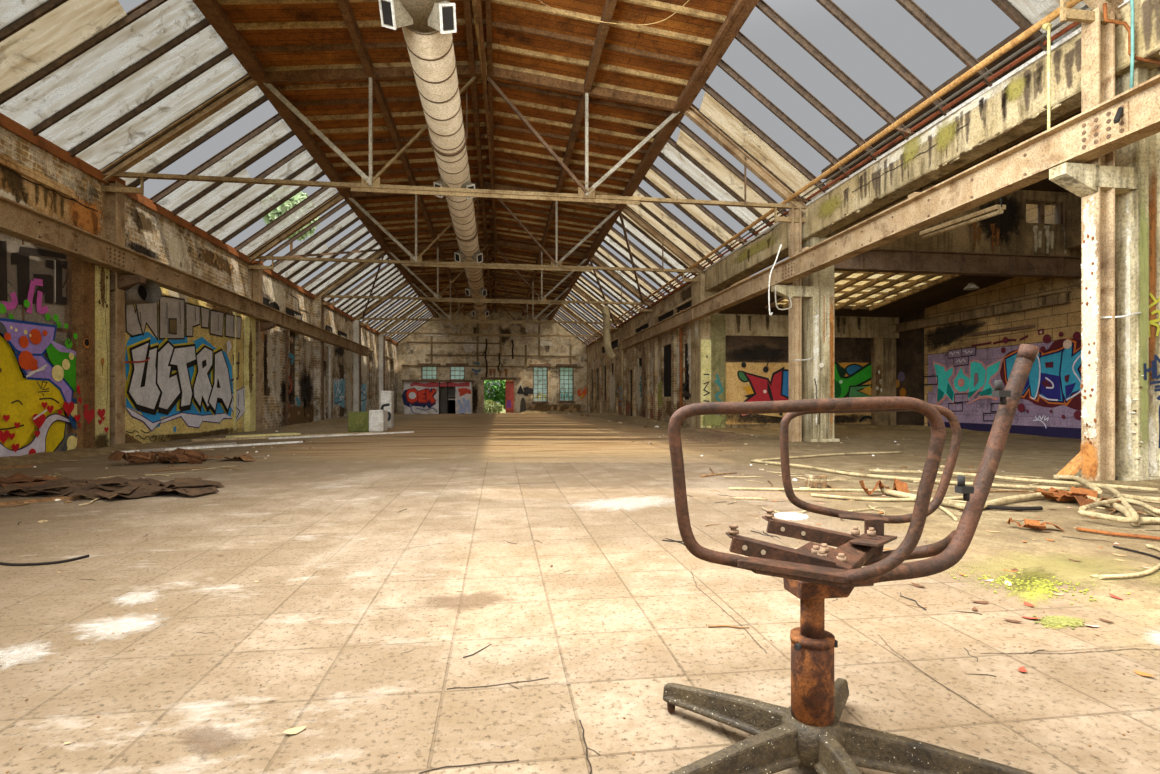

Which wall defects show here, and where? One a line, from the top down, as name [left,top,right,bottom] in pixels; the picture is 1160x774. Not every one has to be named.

damp [1142,0,1160,46]
crack [579,720,600,774]